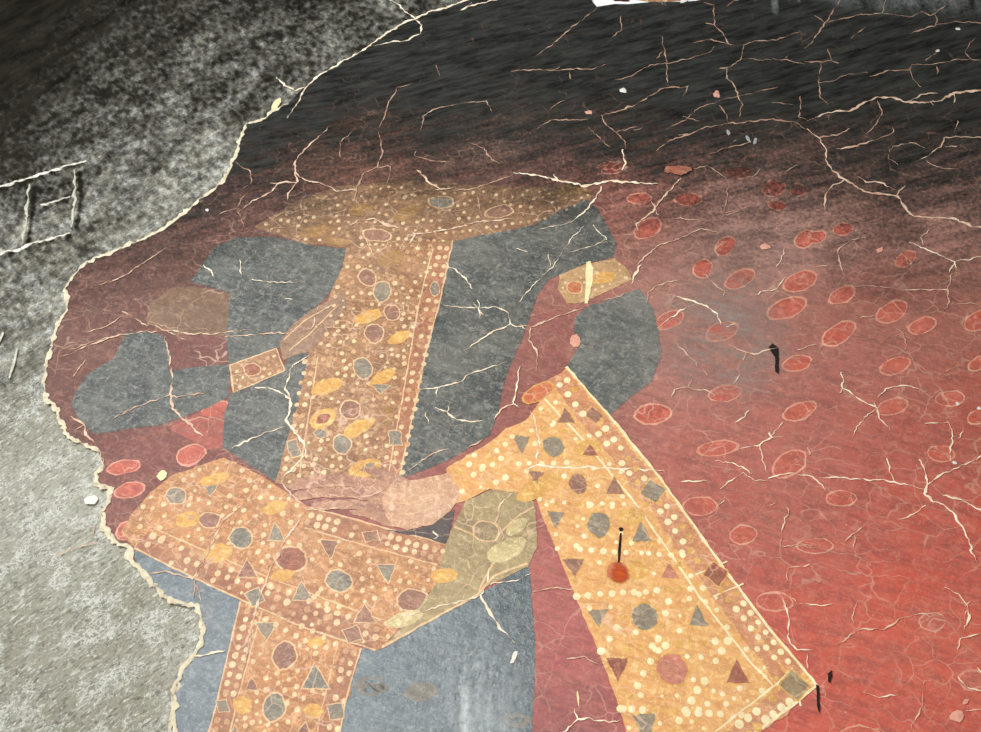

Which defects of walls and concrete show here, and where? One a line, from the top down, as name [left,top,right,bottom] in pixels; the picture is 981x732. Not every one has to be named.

peeling [664,165,693,176]
crack [60,309,363,436]
flaking render [0,0,470,732]
peeling [570,334,581,347]
crack [195,0,981,669]
spalling [769,343,779,374]
crack [71,416,94,442]
crack [148,492,256,604]
spalling [816,671,833,713]
crack [958,667,981,711]
crack [564,709,619,732]